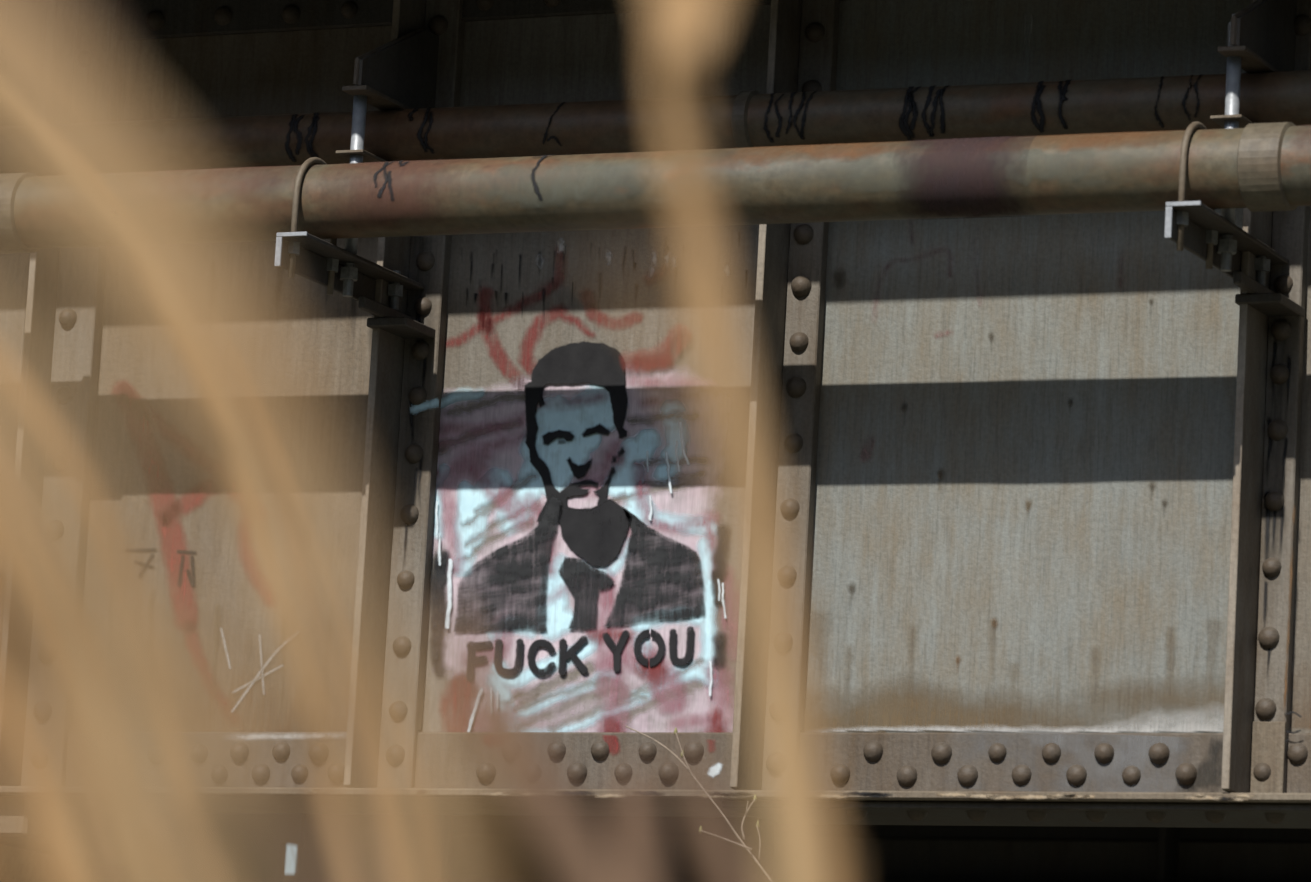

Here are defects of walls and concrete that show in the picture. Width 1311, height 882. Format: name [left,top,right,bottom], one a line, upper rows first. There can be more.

rust [760,143,870,159]
rust [1064,132,1146,144]
rust [910,136,1018,218]
rust [818,689,1058,732]